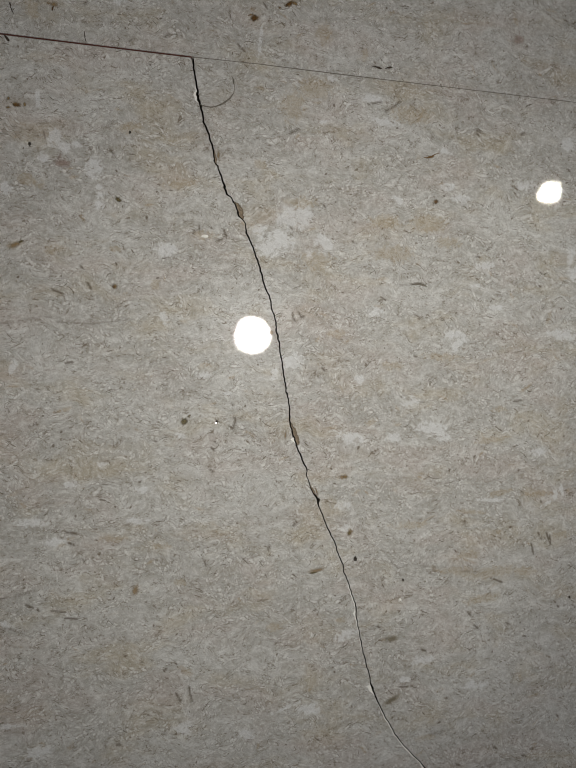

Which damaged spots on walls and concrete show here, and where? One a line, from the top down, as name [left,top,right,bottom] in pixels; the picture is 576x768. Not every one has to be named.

crack [191,59,426,768]